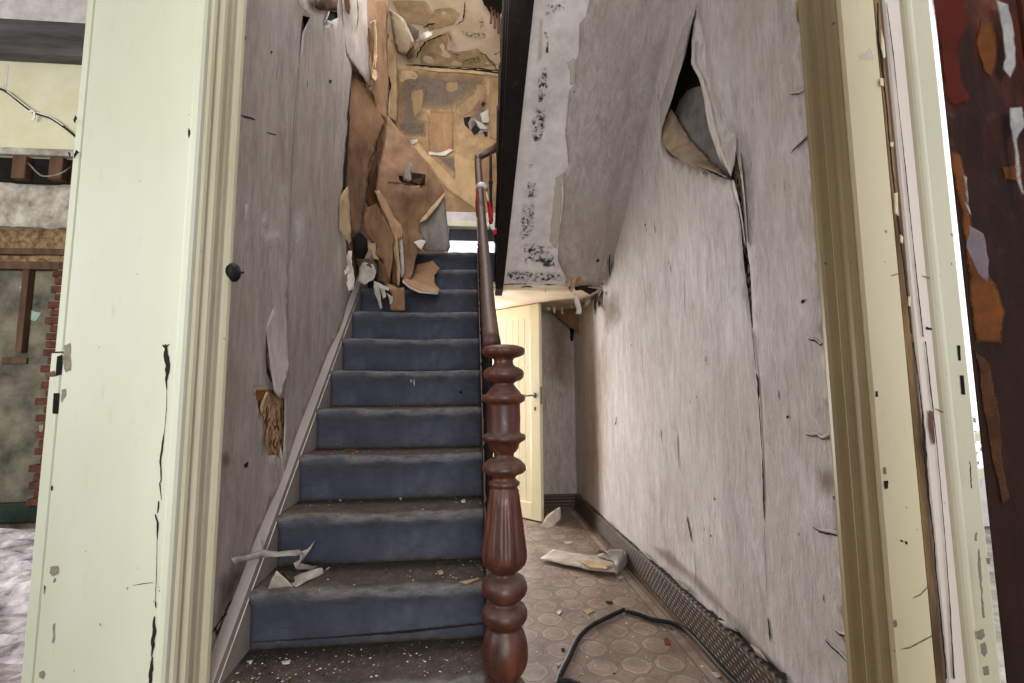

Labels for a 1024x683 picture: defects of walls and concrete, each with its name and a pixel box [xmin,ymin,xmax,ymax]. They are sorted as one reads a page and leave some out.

peeling [389,0,498,140]
peeling [413,142,476,210]
damp [532,73,547,141]
peeling [933,0,969,105]
peeling [977,1,1015,77]
peeling [1002,108,1024,188]
spalling [354,232,368,270]
damp [508,183,560,282]
peeling [952,152,1009,503]
crack [752,331,767,586]
crack [133,344,170,683]